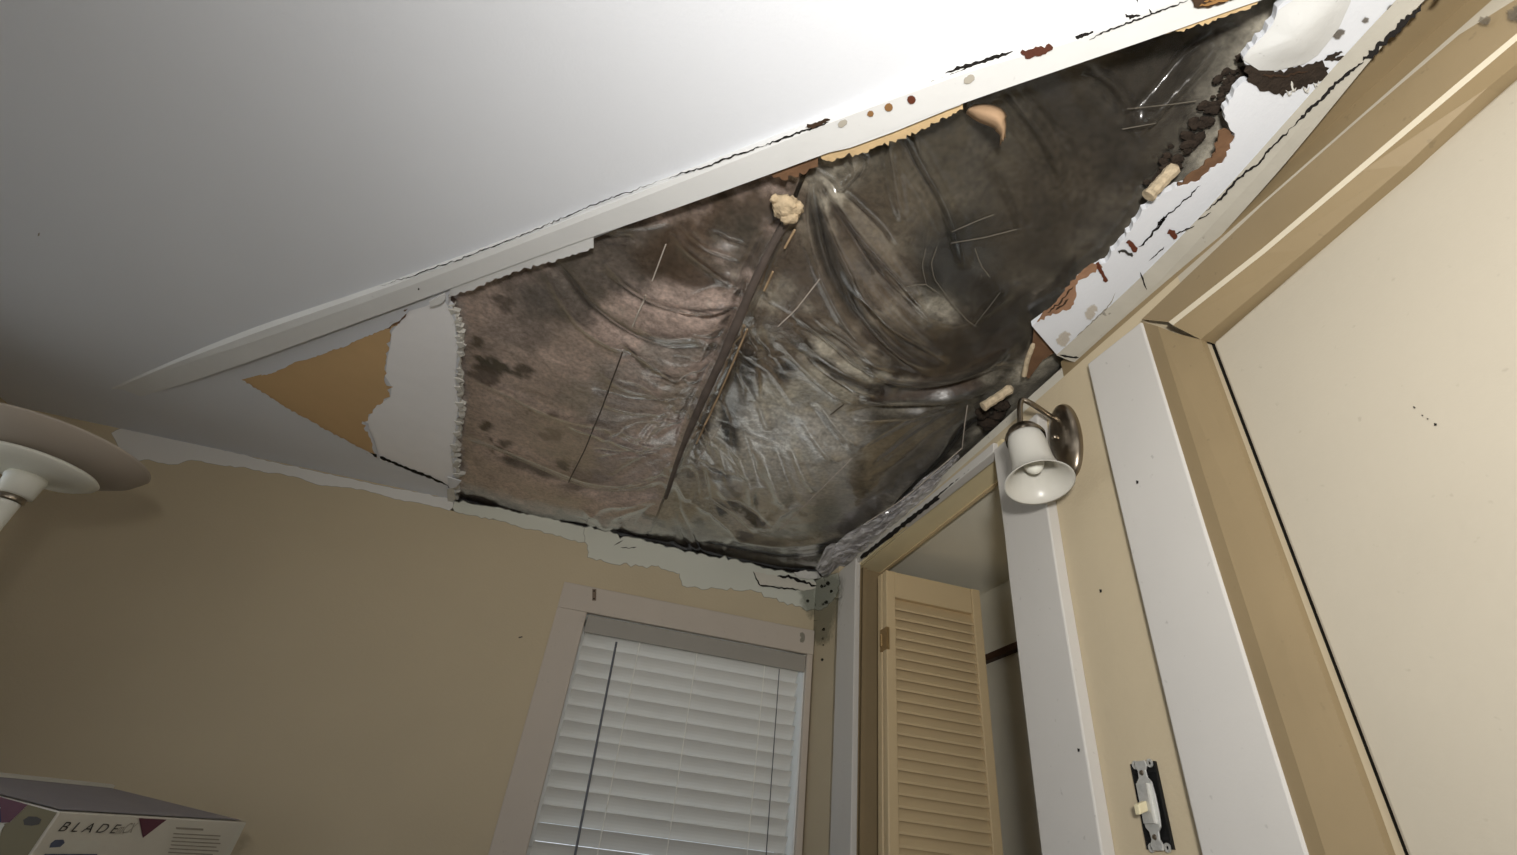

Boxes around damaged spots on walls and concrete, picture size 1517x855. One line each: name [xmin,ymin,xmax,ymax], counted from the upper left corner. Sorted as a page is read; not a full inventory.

crack [1092,0,1188,39]
peeling [1021,44,1053,59]
peeling [966,104,1007,145]
crack [1139,0,1435,261]
peeling [366,300,466,489]
spalling [753,570,821,591]